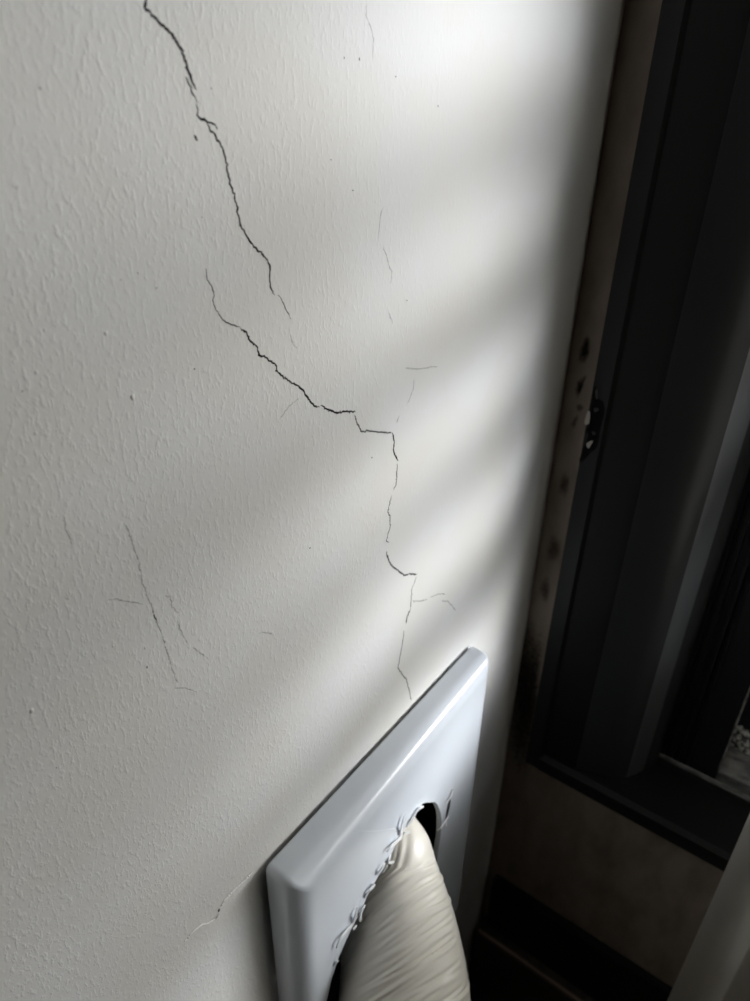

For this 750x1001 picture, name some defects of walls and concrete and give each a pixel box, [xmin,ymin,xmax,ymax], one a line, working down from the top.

crack [144,0,291,319]
crack [206,270,417,699]